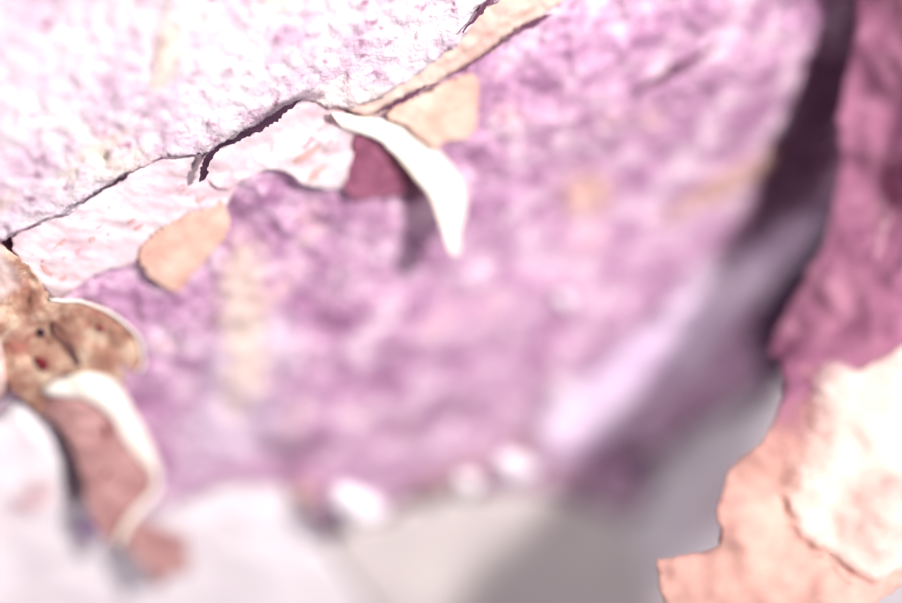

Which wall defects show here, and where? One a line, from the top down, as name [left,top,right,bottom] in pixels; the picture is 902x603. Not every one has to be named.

peeling [0,0,563,591]
peeling [328,0,902,603]